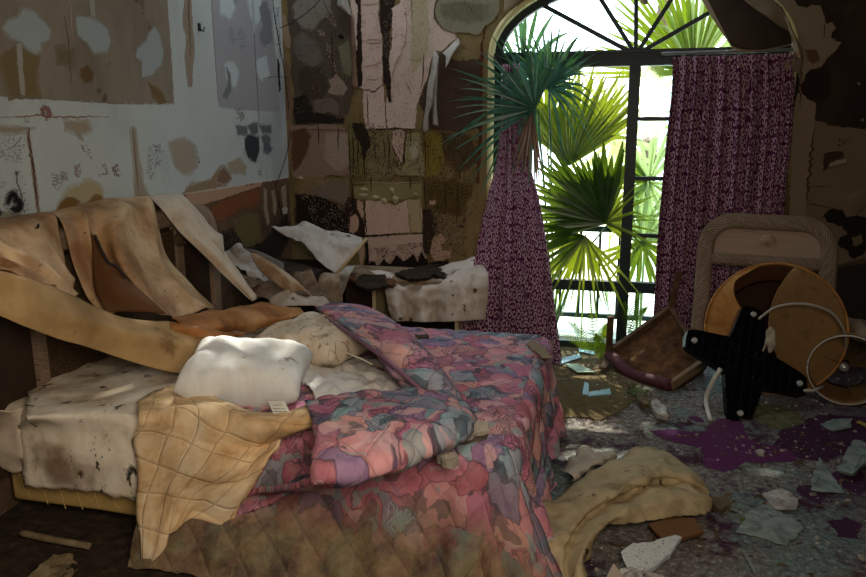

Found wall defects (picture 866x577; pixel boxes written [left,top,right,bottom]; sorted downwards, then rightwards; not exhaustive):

damp [0,123,36,218]
peeling [0,0,177,115]
damp [216,0,478,267]
flaking render [281,0,501,177]
peeling [702,0,792,52]
peeling [794,0,866,129]
flaking render [348,198,452,265]
peeling [822,204,866,261]